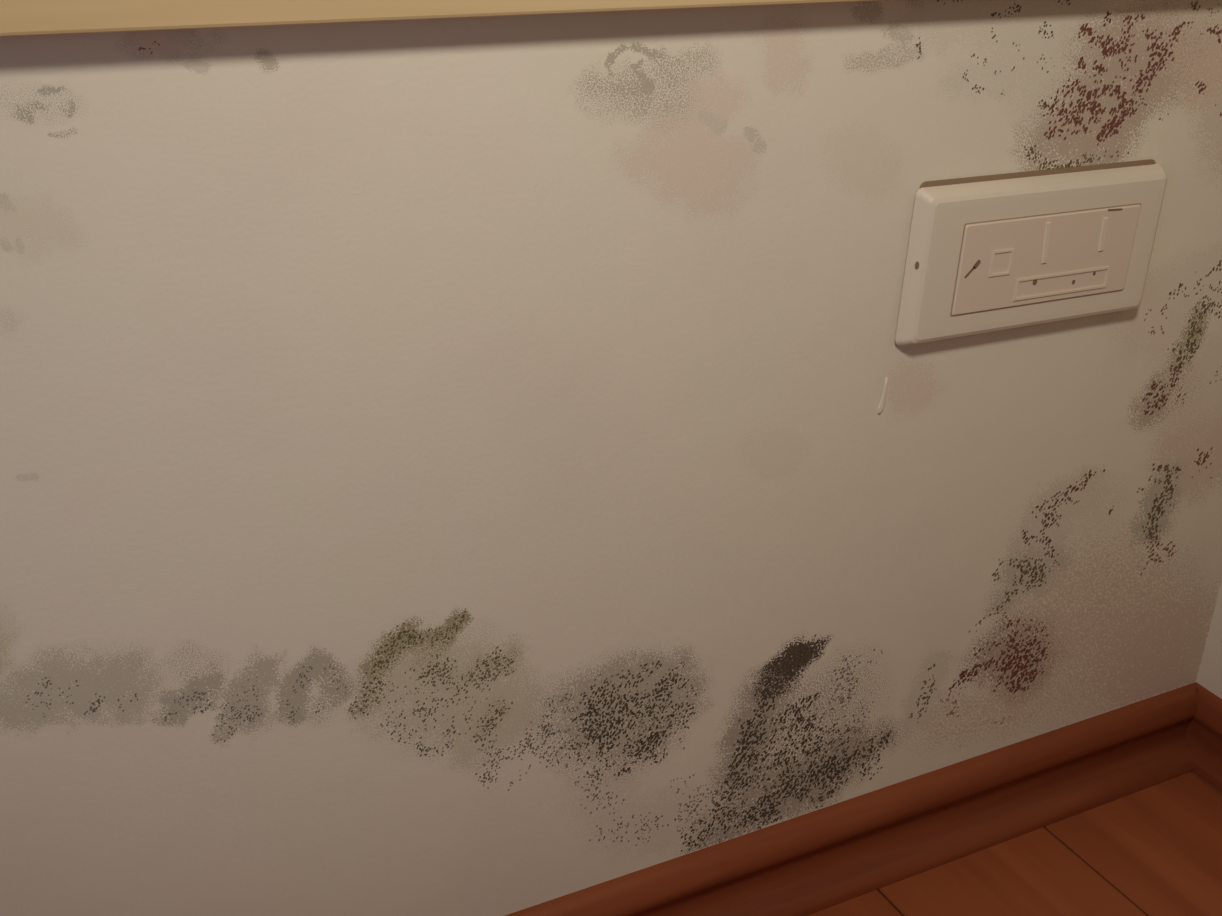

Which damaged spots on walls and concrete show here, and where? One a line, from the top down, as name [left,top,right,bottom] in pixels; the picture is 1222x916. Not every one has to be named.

damp [0,78,90,139]
damp [254,48,281,74]
damp [568,39,729,137]
damp [843,0,1222,191]
damp [0,236,1222,866]